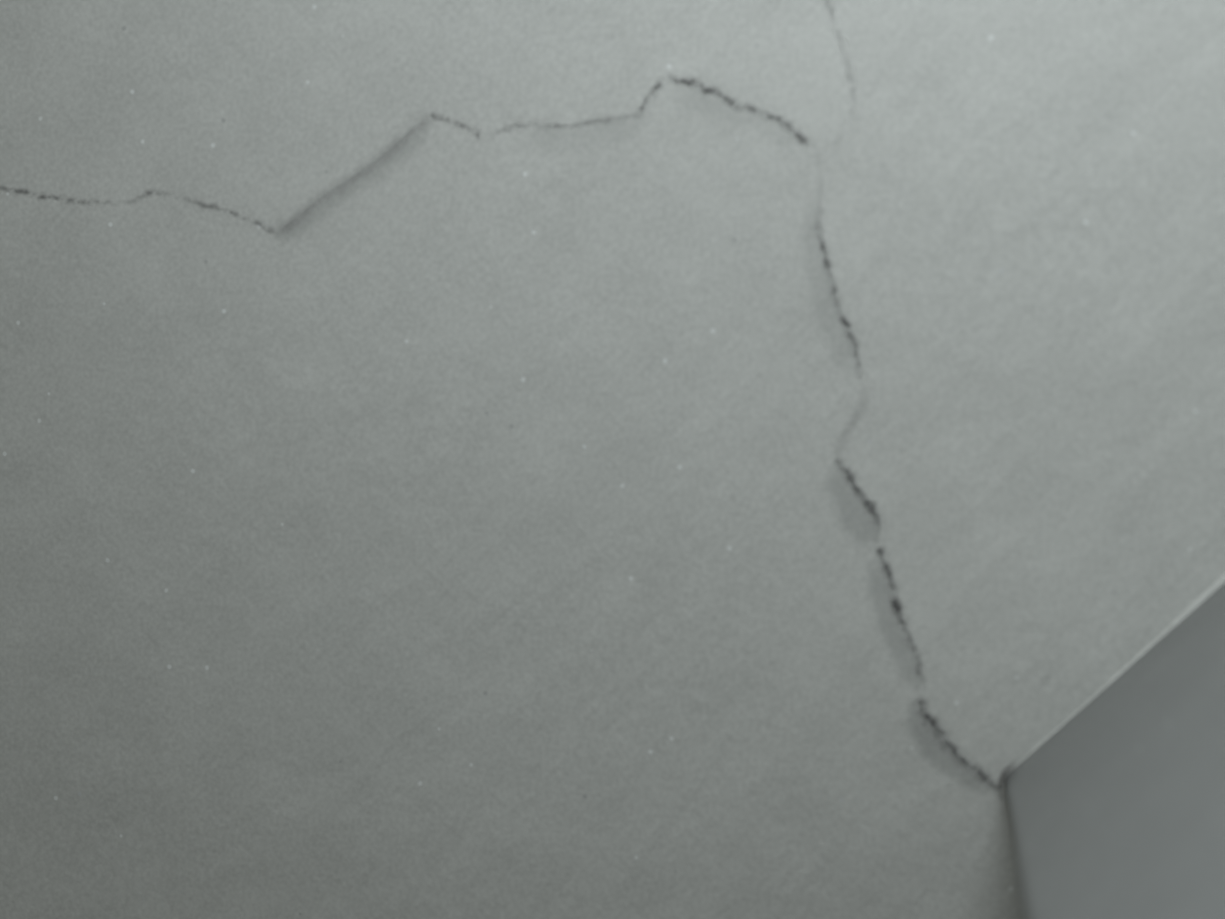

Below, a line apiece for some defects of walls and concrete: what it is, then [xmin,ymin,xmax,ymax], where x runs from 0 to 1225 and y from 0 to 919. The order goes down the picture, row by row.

crack [879,550,901,622]